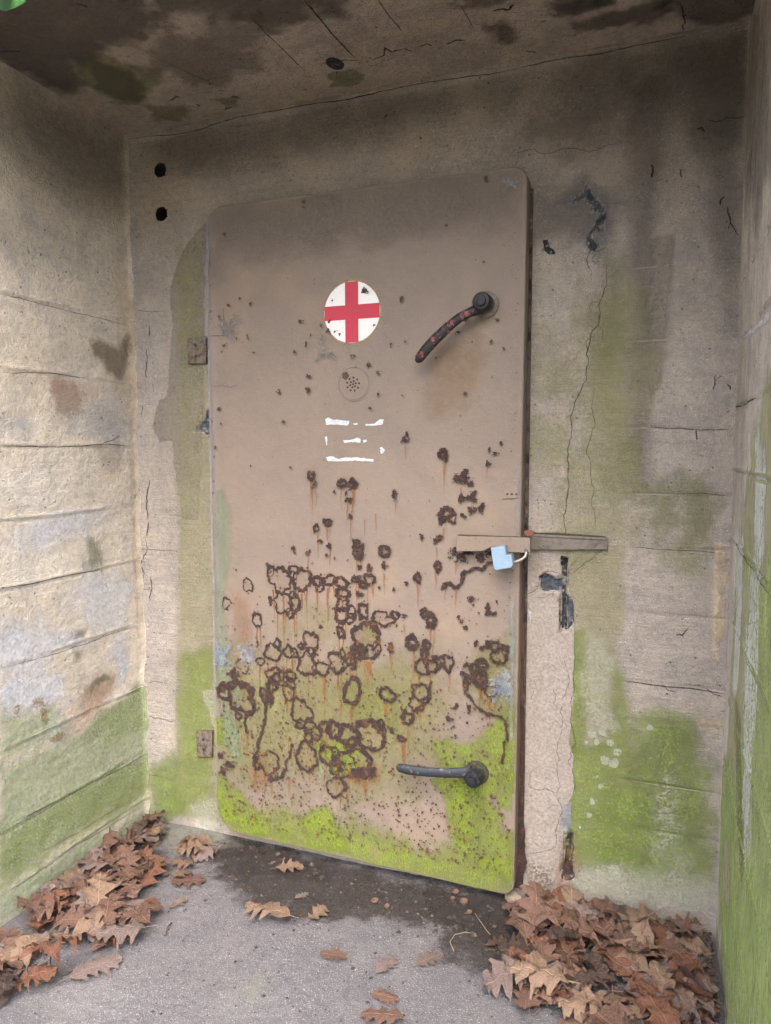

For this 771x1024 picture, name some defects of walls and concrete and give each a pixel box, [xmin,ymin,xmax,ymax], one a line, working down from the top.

water stain [0,0,344,101]
water stain [553,0,755,30]
spalling [570,182,607,251]
crack [563,249,607,533]
rust [437,448,448,462]
spalling [536,554,574,633]
rust [213,469,527,888]
water stain [563,632,645,862]